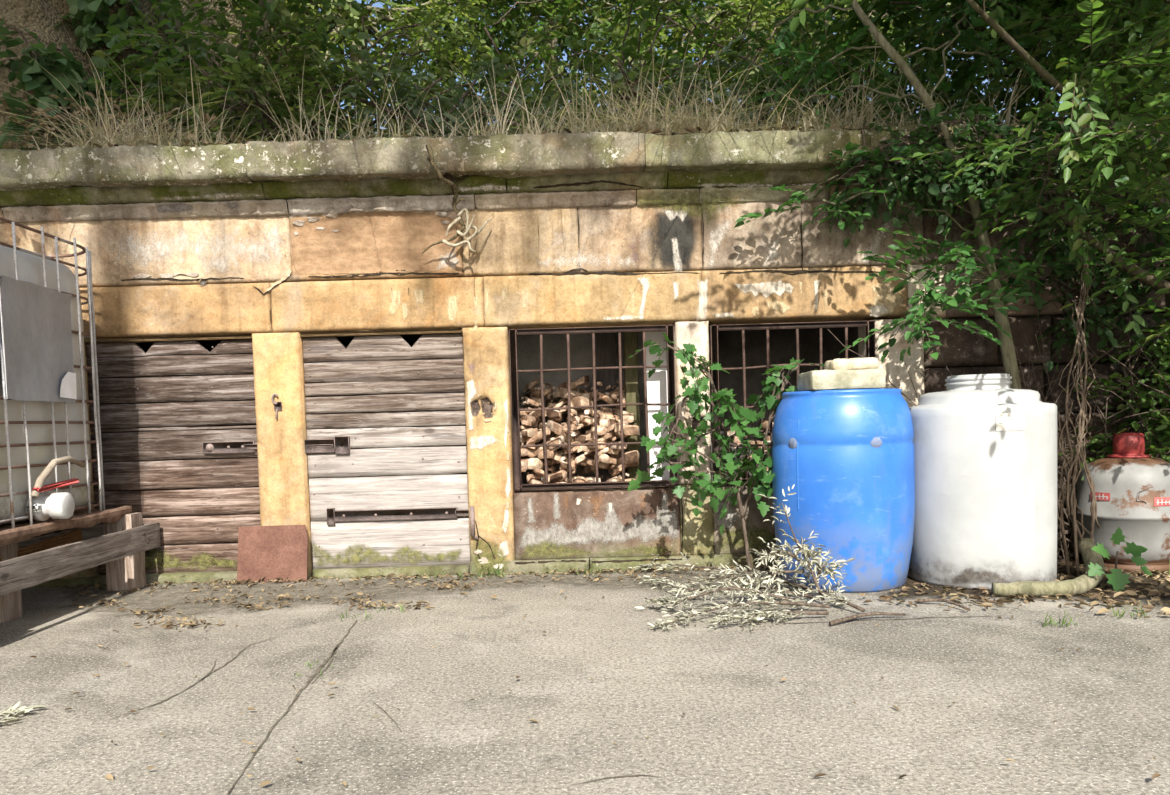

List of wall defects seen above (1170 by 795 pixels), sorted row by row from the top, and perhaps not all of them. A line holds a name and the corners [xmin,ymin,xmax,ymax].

leakage [652,210,695,300]
leakage [710,222,728,262]
crack [121,270,476,326]
leakage [698,280,733,319]
peeling [736,281,793,315]